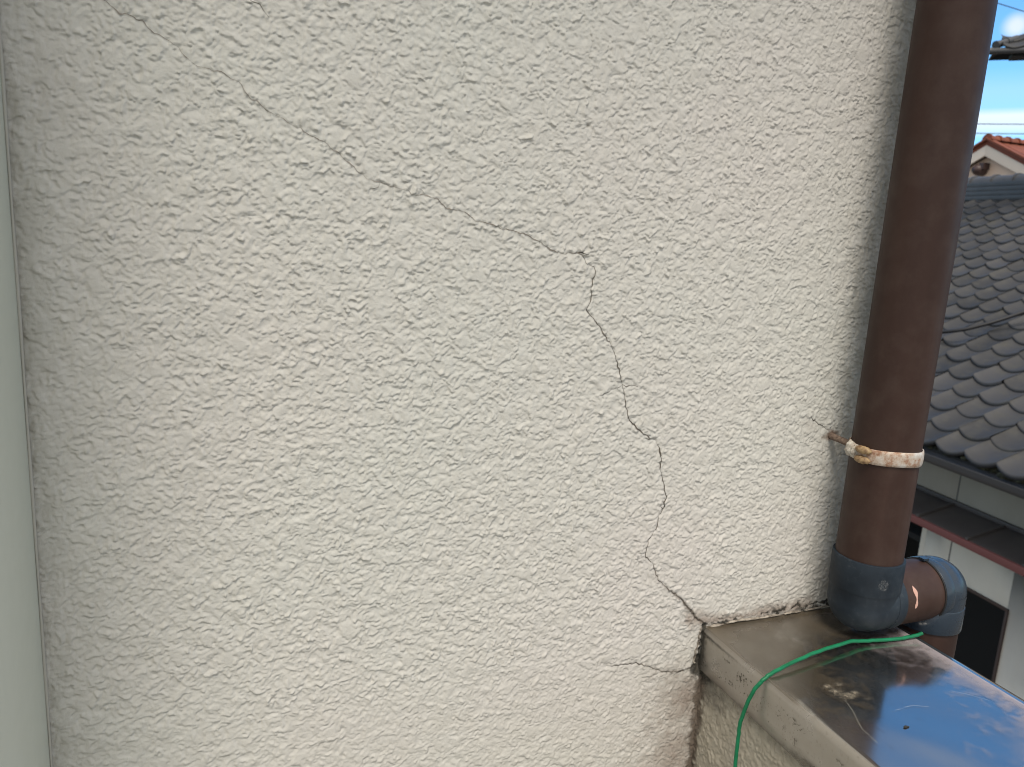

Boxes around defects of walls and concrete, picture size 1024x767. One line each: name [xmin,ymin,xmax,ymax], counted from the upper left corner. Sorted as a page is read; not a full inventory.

crack [104,0,704,623]
crack [614,662,694,678]